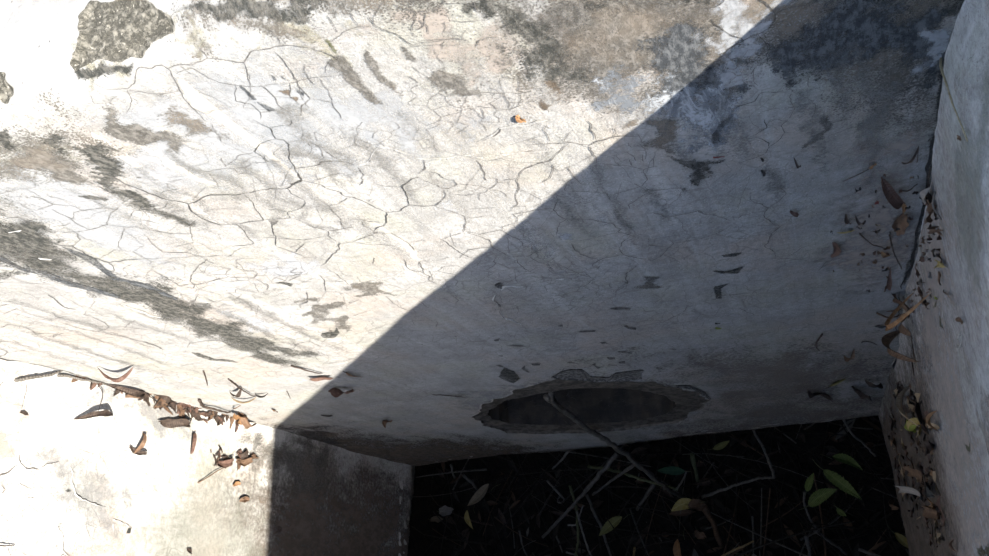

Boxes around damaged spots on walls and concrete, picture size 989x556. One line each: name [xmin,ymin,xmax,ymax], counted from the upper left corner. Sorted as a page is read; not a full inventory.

spalling [70,0,175,71]
spalling [0,72,13,104]
leakage [0,0,964,367]
crack [0,0,935,466]
crack [0,455,59,498]